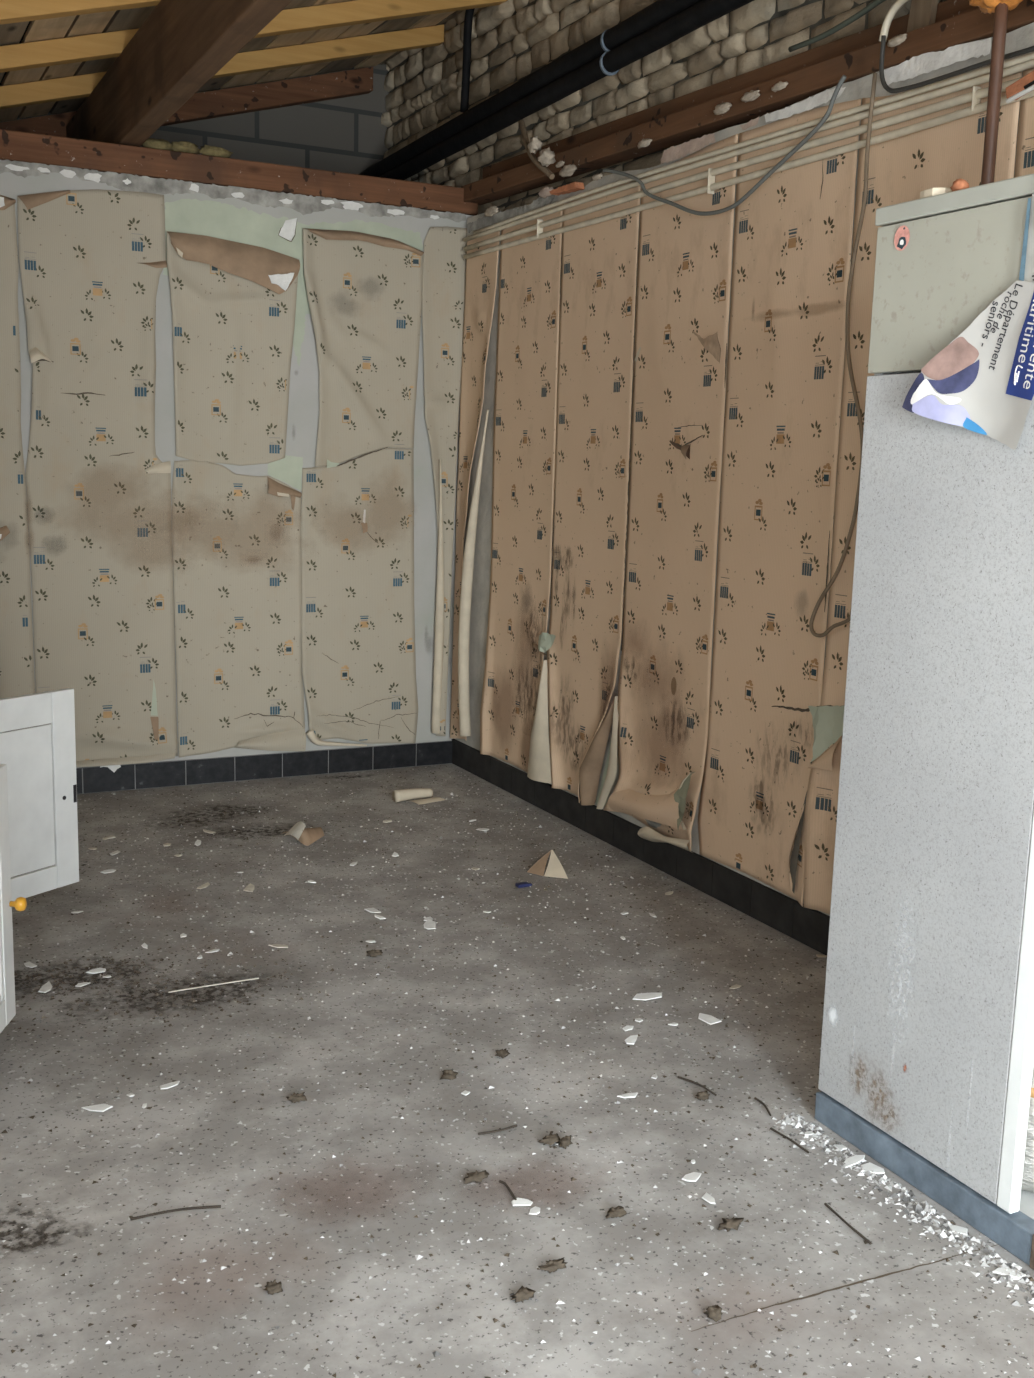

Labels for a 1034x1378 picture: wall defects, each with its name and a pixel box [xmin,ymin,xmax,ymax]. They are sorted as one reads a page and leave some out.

spalling [661,133,716,164]
flaking render [0,159,555,367]
flaking render [268,455,303,491]
flaking render [538,632,556,654]
flaking render [808,705,844,764]